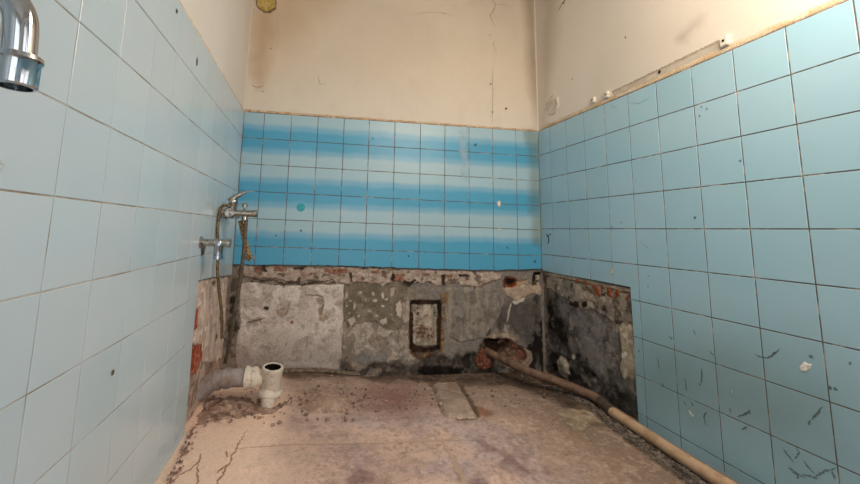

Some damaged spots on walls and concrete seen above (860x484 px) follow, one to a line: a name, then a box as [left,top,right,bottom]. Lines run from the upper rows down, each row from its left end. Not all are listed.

peeling [344,270,416,350]
spalling [444,275,533,370]
water stain [497,295,638,417]
spalling [545,269,633,324]
crack [174,429,248,484]